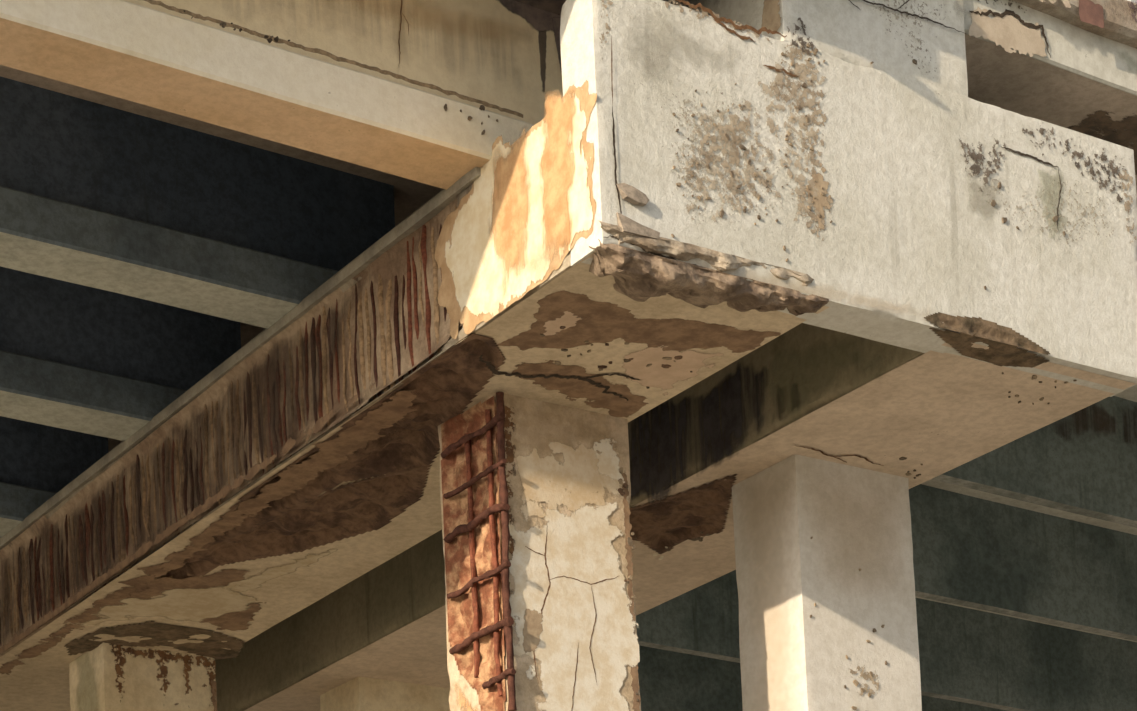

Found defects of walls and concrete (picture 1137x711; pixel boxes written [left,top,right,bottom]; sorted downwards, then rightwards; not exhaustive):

spalling [969,7,1051,58]
crack [1002,147,1062,231]
mould [1022,111,1137,243]
spalling [0,0,833,711]
crack [470,354,639,401]
leakage [2,305,345,636]
rust [0,381,420,675]
rust [109,644,216,701]
crack [525,535,618,711]